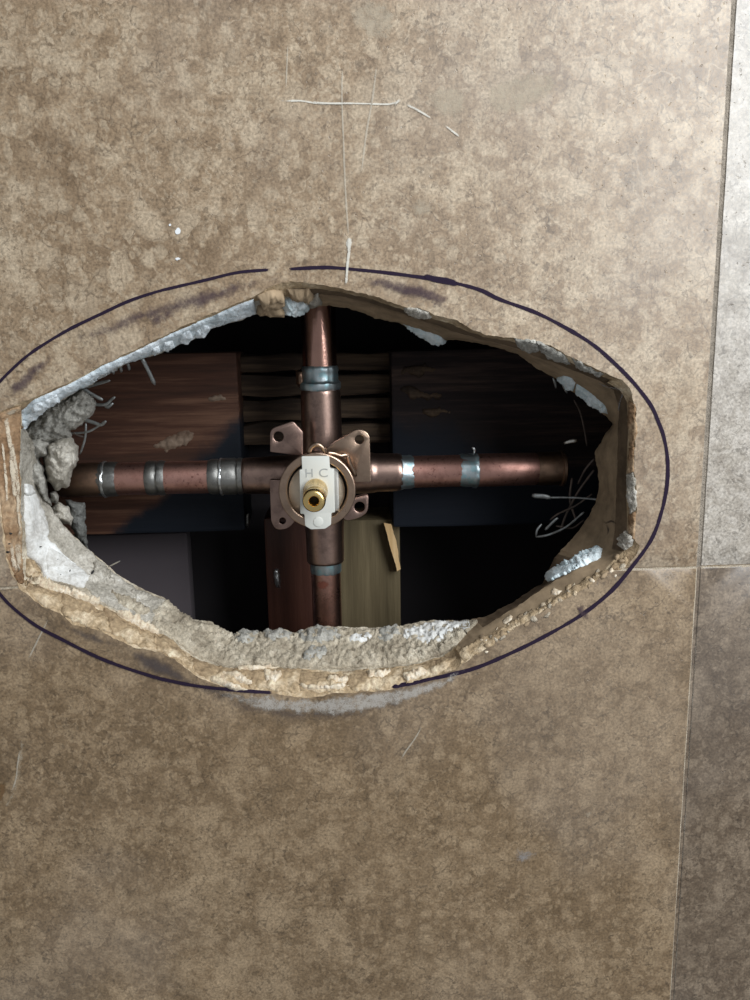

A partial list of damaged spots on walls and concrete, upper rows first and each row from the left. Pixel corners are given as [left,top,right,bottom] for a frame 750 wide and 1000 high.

spalling [0,288,638,694]